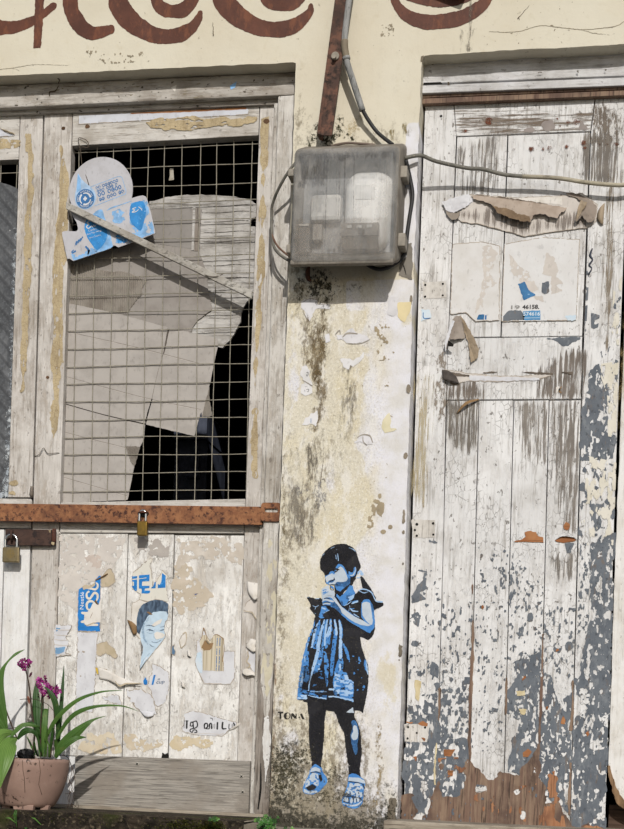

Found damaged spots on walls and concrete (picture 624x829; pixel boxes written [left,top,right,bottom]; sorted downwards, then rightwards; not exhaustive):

peeling [0,133,34,392]
peeling [50,145,69,438]
peeling [146,116,269,386]
water stain [294,269,335,314]
water stain [303,318,326,431]
flaking render [301,298,352,321]
flaking render [325,295,413,370]
peeling [134,537,180,552]
water stain [282,447,326,544]
peeling [387,104,624,829]